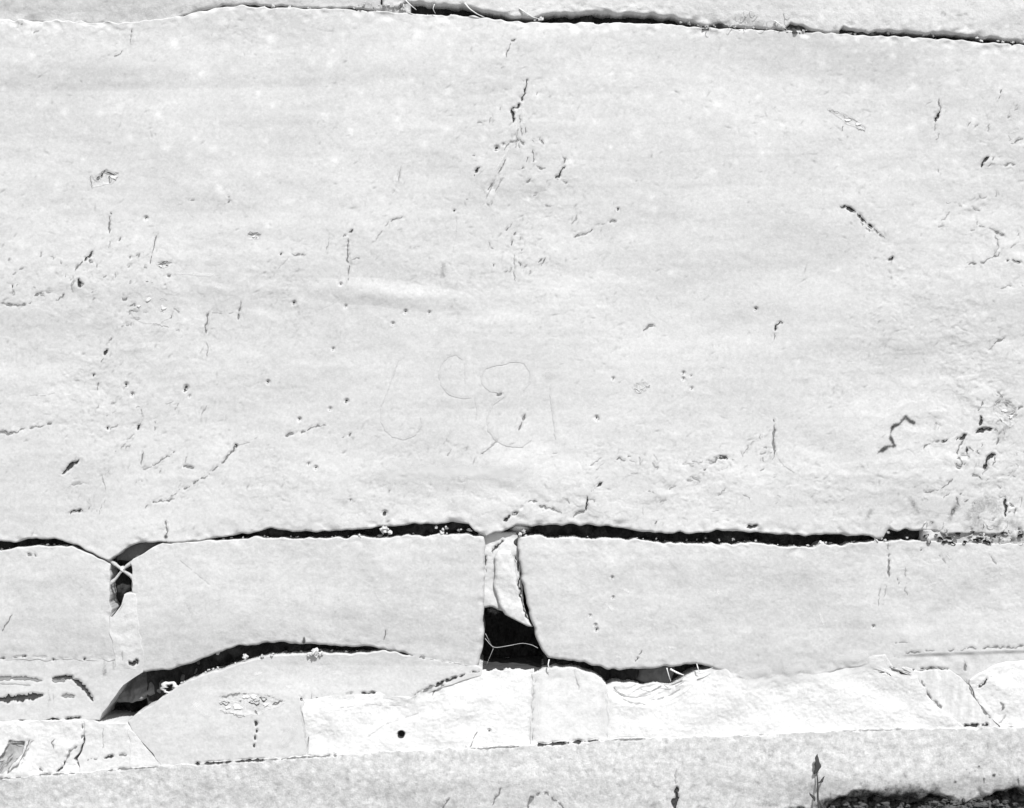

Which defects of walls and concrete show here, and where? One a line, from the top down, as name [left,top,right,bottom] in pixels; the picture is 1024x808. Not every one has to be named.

crack [467,80,568,207]
crack [840,205,885,238]
crack [485,419,795,624]
crack [878,543,908,606]
crack [341,655,476,736]
crack [895,641,1024,727]